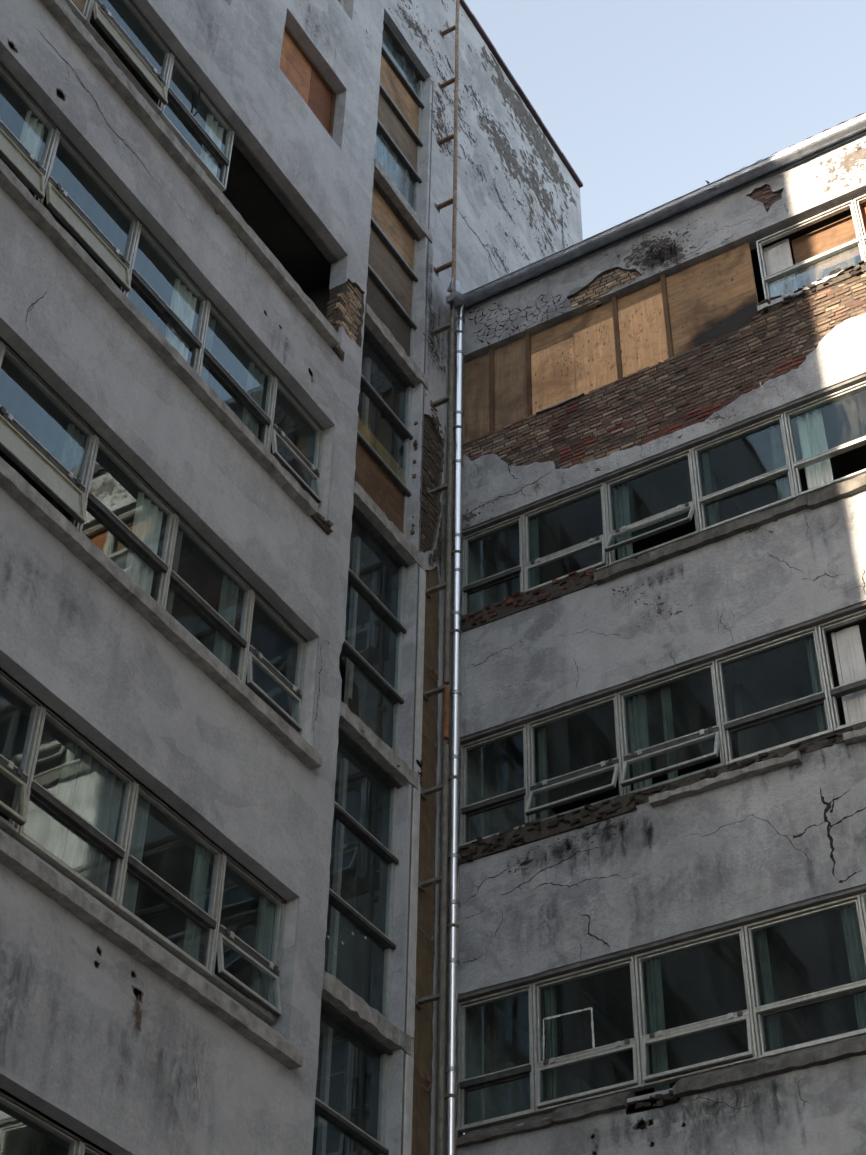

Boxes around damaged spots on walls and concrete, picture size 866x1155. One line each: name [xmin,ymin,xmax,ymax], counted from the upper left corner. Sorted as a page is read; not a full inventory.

crack [35,28,162,188]
peeling [389,0,579,275]
flaking render [748,186,782,212]
peeling [813,139,866,201]
flaking render [568,216,706,309]
flaking render [326,282,362,346]
crack [468,294,570,347]
flaking render [463,272,866,474]
flaking render [410,393,446,553]
crack [687,789,866,883]
crack [462,846,634,963]